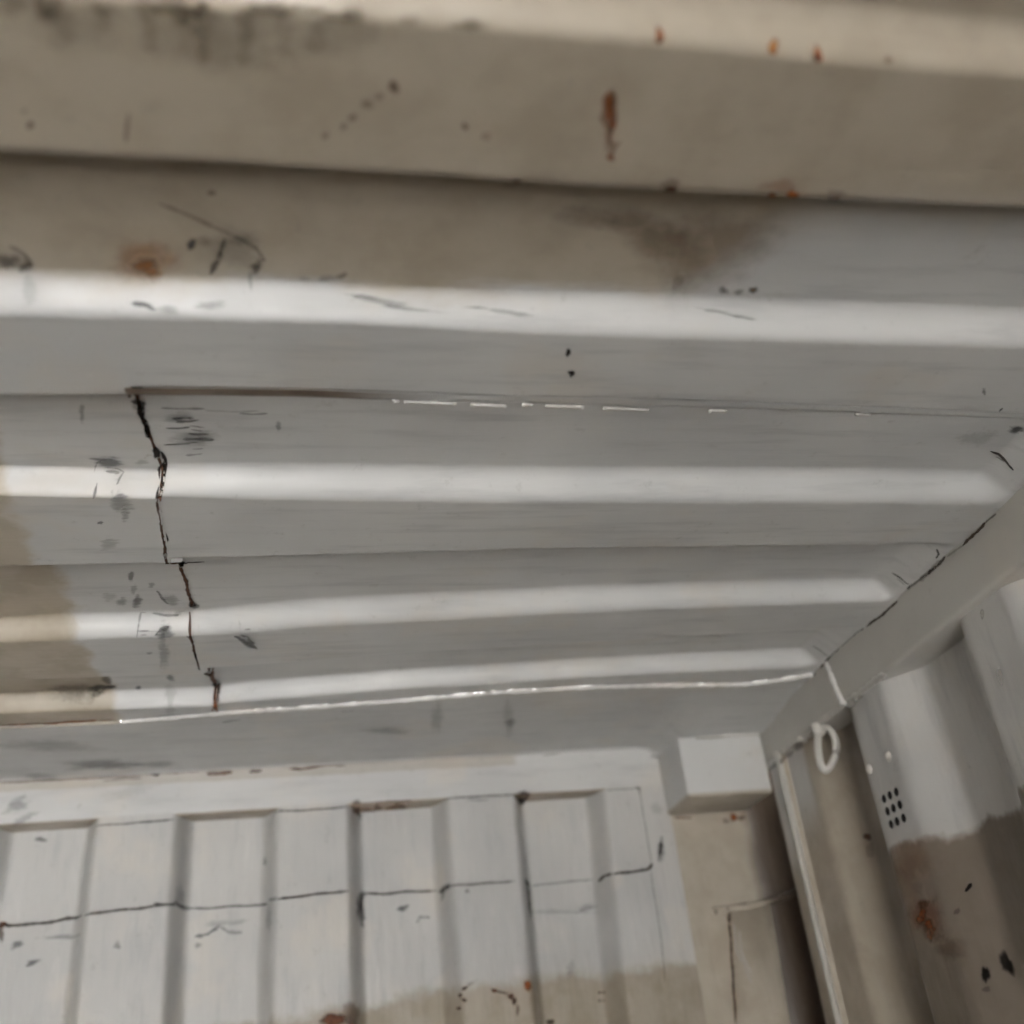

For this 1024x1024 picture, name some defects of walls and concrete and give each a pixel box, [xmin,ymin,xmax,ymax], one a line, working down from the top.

corrosion [603,93,616,128]
crack [128,387,218,709]
crack [813,514,996,676]
crack [598,863,653,882]
crack [0,881,514,928]